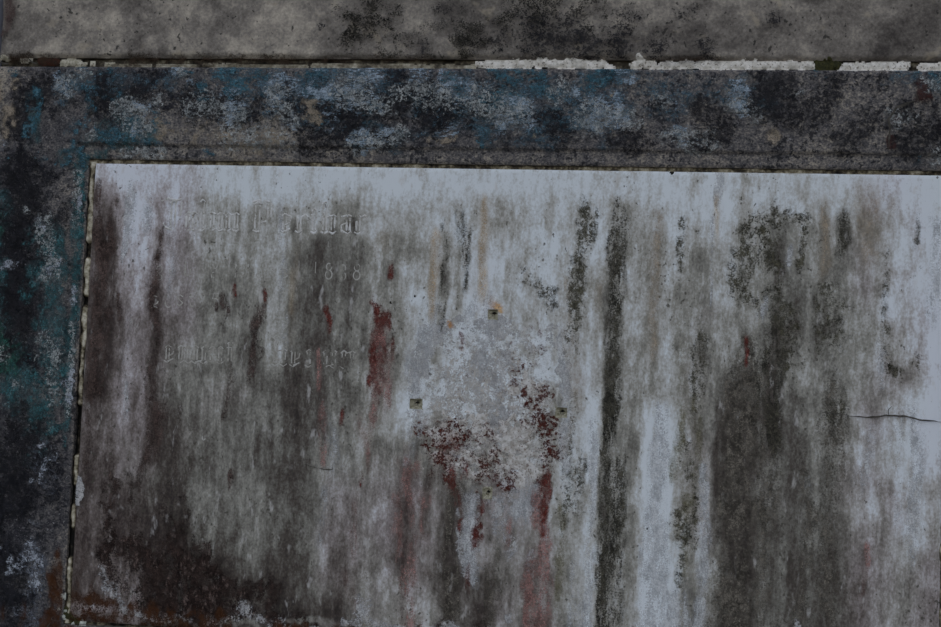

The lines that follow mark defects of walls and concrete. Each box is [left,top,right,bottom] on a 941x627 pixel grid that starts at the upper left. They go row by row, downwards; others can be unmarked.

damp [0,0,941,385]
damp [0,393,65,627]
damp [61,367,75,404]
corrosion [39,548,232,627]
damp [85,179,318,627]
corrosion [392,417,517,627]
damp [404,300,519,438]
damp [434,446,542,627]
corrosion [497,330,564,627]
damp [520,197,627,627]
damp [639,199,851,627]
crack [820,406,938,422]